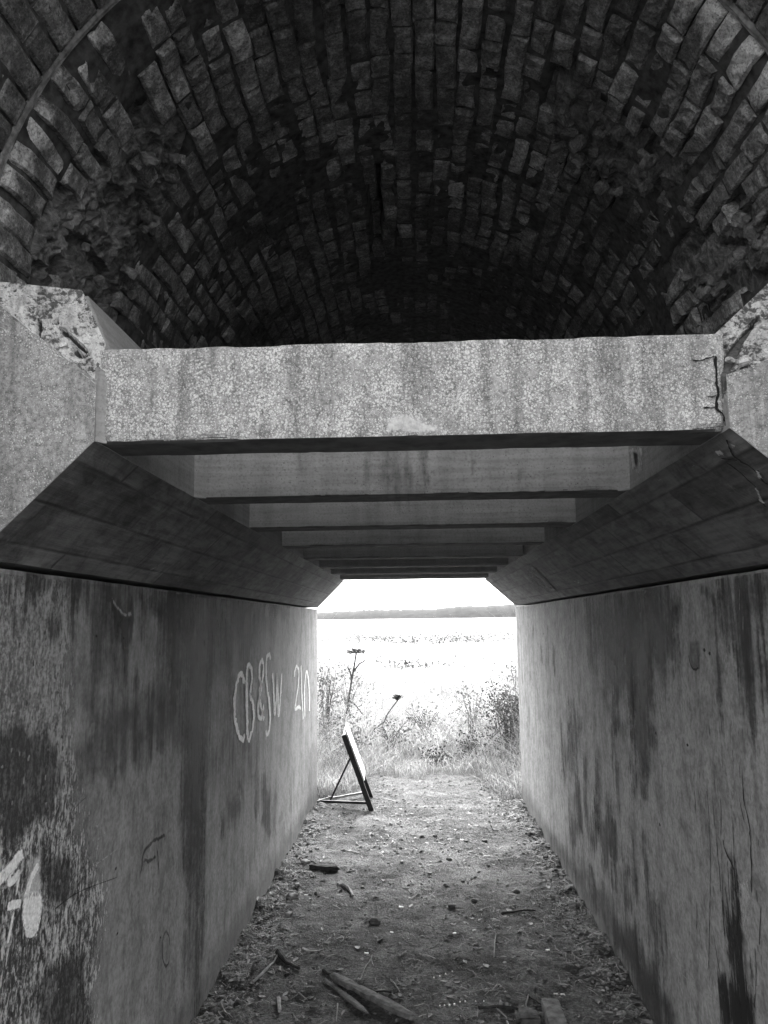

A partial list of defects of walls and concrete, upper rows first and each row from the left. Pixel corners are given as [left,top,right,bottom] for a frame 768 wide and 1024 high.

spalling [0,101,187,383]
crack [693,356,767,507]
damp [701,573,768,735]
damp [57,578,290,1018]
damp [550,585,682,1024]
damp [694,750,762,1024]